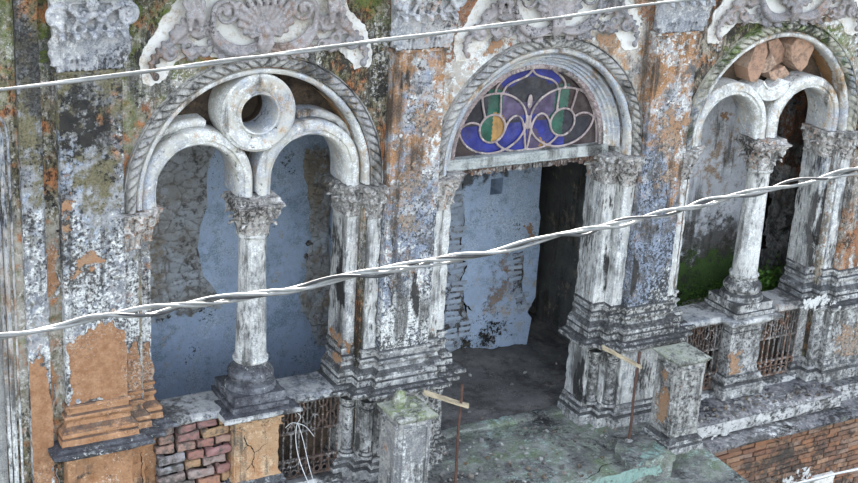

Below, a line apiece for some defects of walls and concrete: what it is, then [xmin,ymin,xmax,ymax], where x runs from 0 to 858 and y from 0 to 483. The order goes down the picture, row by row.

flaking render [444,178,473,352]
flaking render [507,251,532,315]
flaking render [29,350,60,483]
flaking render [66,317,155,406]